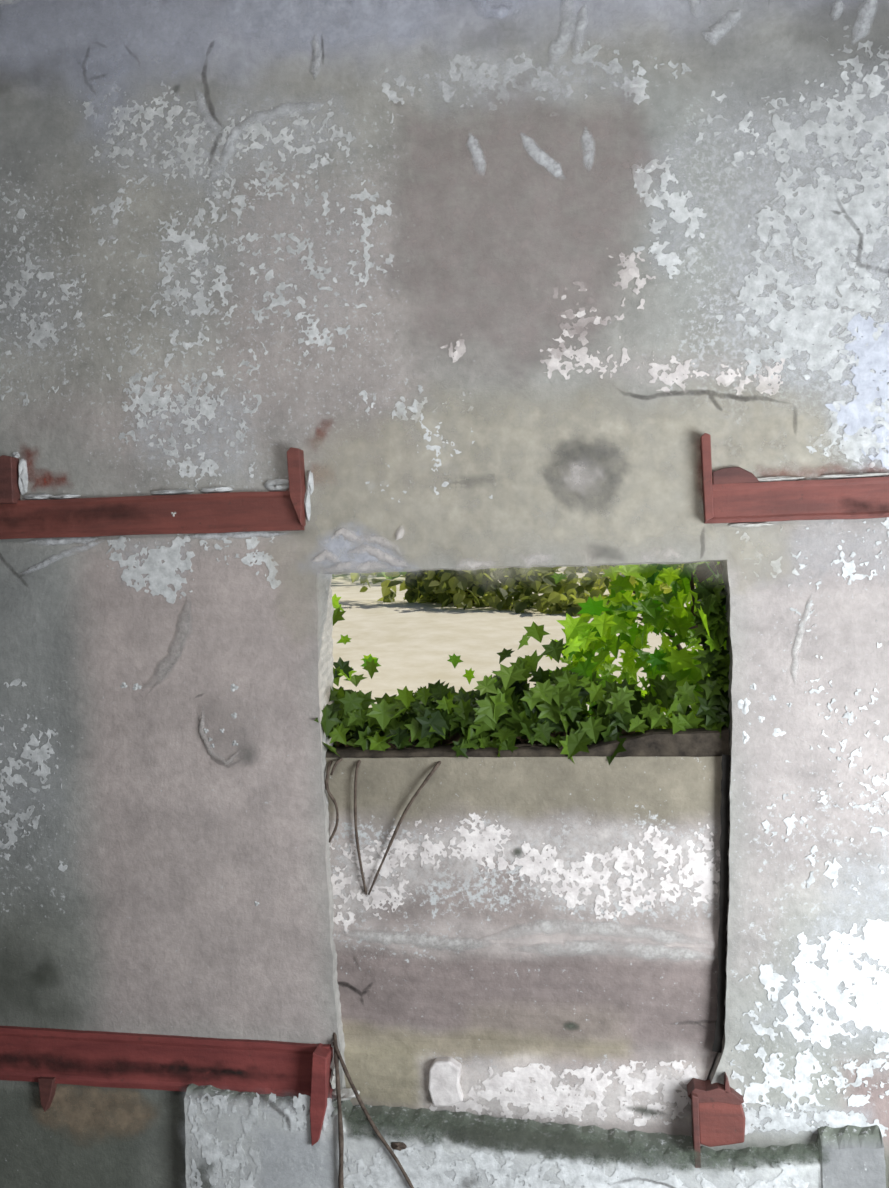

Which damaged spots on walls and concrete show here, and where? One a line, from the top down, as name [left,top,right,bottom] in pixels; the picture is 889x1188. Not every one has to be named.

peeling [0,81,399,494]
peeling [440,333,466,363]
peeling [540,25,889,470]
corrosion [27,452,65,486]
peeling [359,374,461,495]
peeling [106,534,281,604]
peeling [0,714,68,861]
flaking render [737,683,786,737]
peeling [761,794,808,846]
peeling [805,678,889,836]
peeling [730,838,889,1137]